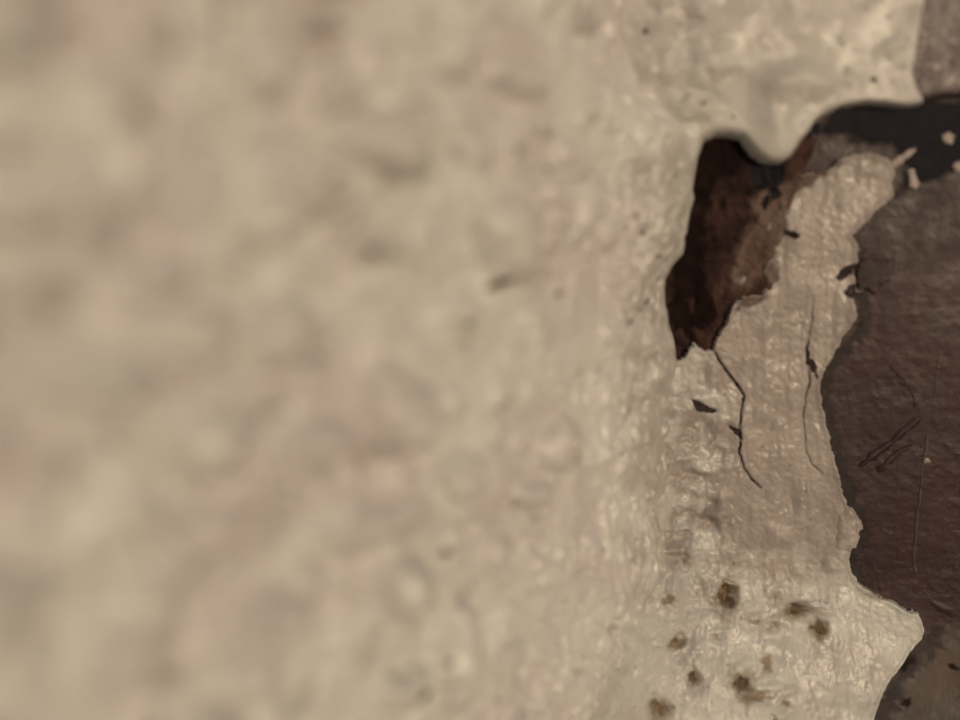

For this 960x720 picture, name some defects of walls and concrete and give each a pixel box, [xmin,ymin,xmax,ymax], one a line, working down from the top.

spalling [665,100,960,360]
crack [803,308,819,470]
crack [691,352,758,486]
corrosion [716,582,735,607]
corrosion [788,604,806,619]
corrosion [809,622,826,639]
corrosion [669,639,685,648]
corrosion [733,676,765,703]
corrosion [652,700,668,720]